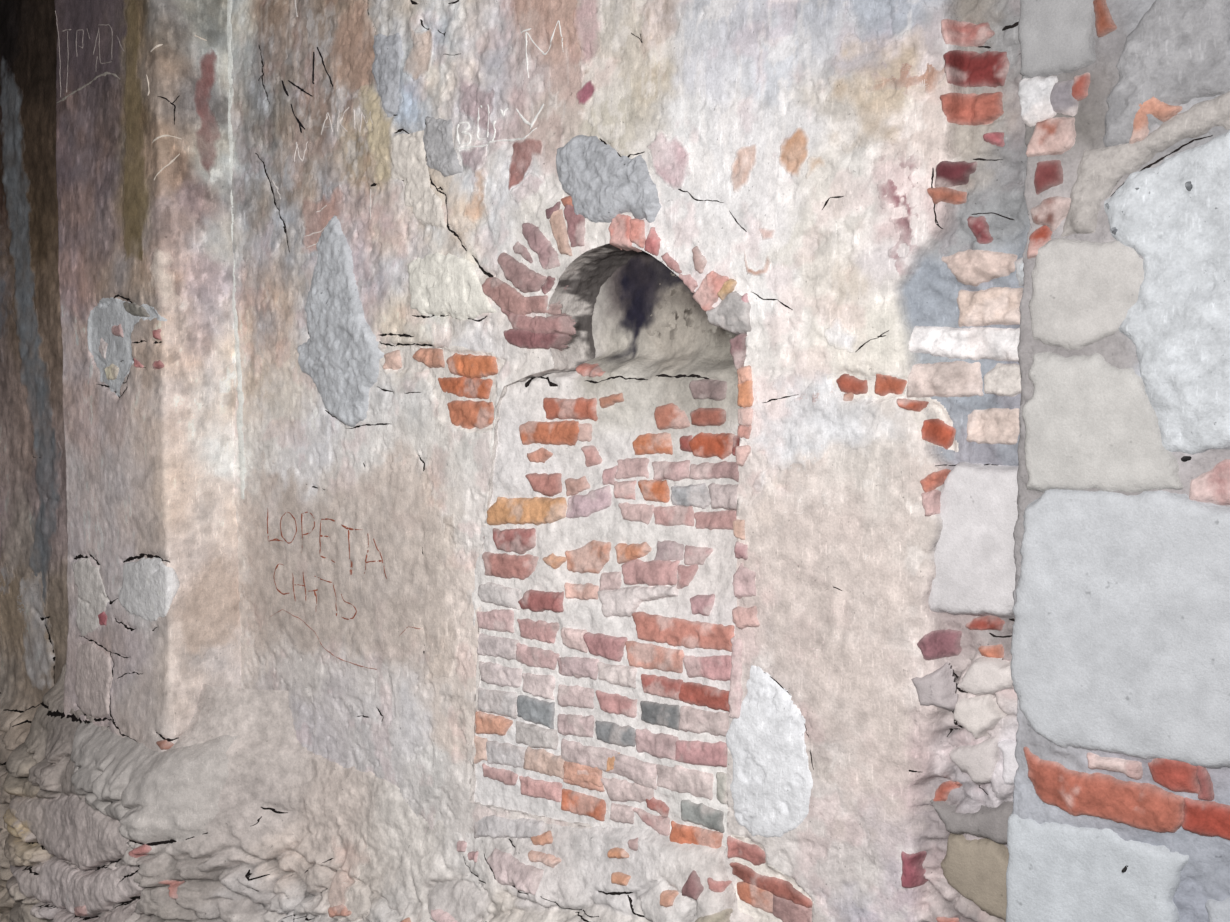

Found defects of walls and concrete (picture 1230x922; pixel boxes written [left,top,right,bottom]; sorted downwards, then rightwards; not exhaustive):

crack [258,45,269,102]
spalling [940,19,1010,147]
crack [255,153,290,252]
crack [371,115,493,277]
spalling [87,247,187,396]
peeling [407,252,496,321]
spalling [379,342,506,434]
crack [74,553,170,565]
spalling [826,161,1024,922]
crack [0,598,179,742]
crack [463,839,645,922]
spalling [727,834,814,922]